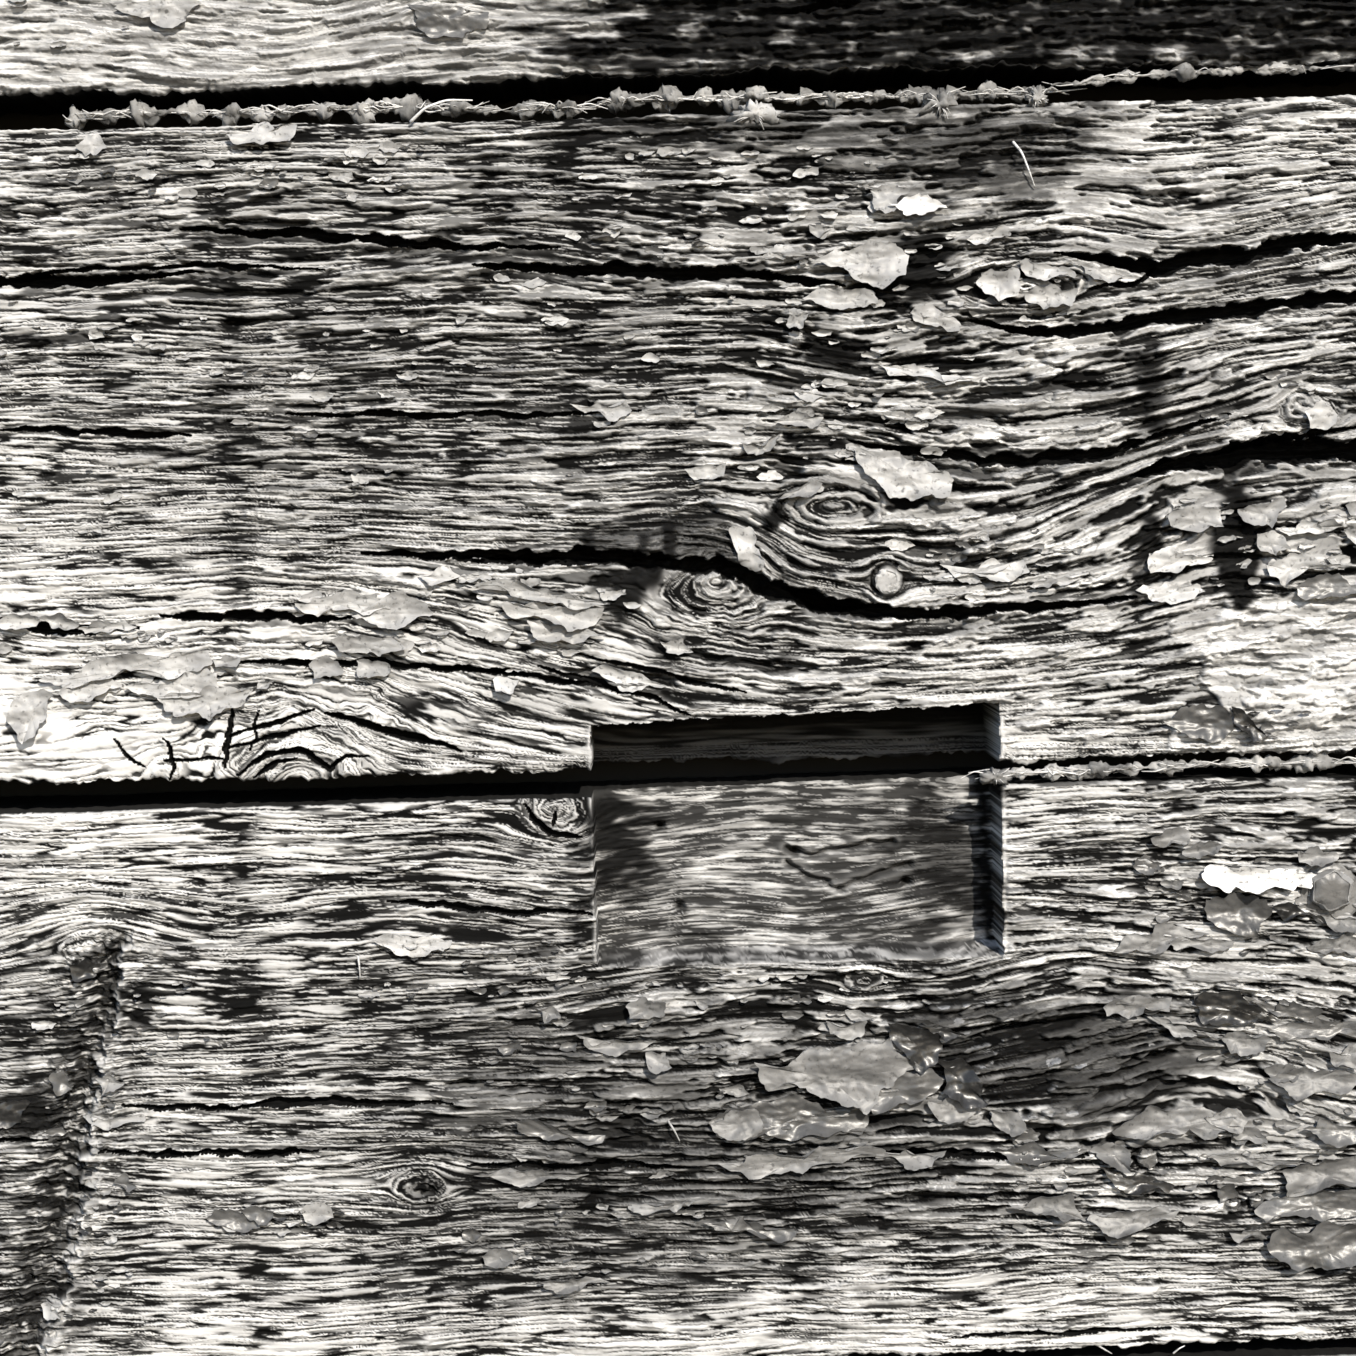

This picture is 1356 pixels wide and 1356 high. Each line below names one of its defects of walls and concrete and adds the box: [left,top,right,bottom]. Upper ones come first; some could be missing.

crack [0,225,846,289]
peeling [729,160,1124,385]
peeling [685,372,954,501]
peeling [0,612,274,744]
crack [0,609,354,637]
peeling [293,565,641,679]
crack [238,652,747,716]
crack [360,545,1133,621]
peeling [1136,484,1356,605]
crack [113,708,463,781]
crack [0,1135,49,1143]
peeling [683,971,1356,1272]